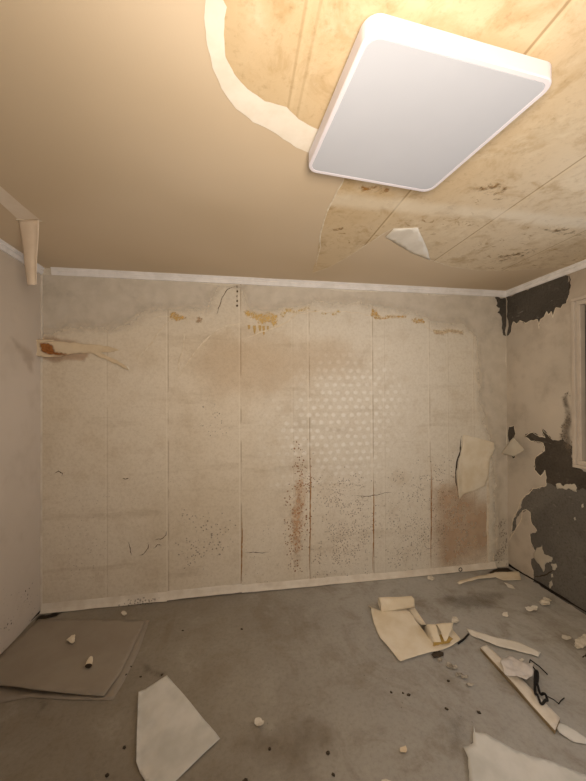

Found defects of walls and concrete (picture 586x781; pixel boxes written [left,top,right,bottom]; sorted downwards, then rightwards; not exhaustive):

peeling [43,275,218,331]
peeling [204,0,586,615]
rust [283,441,314,574]